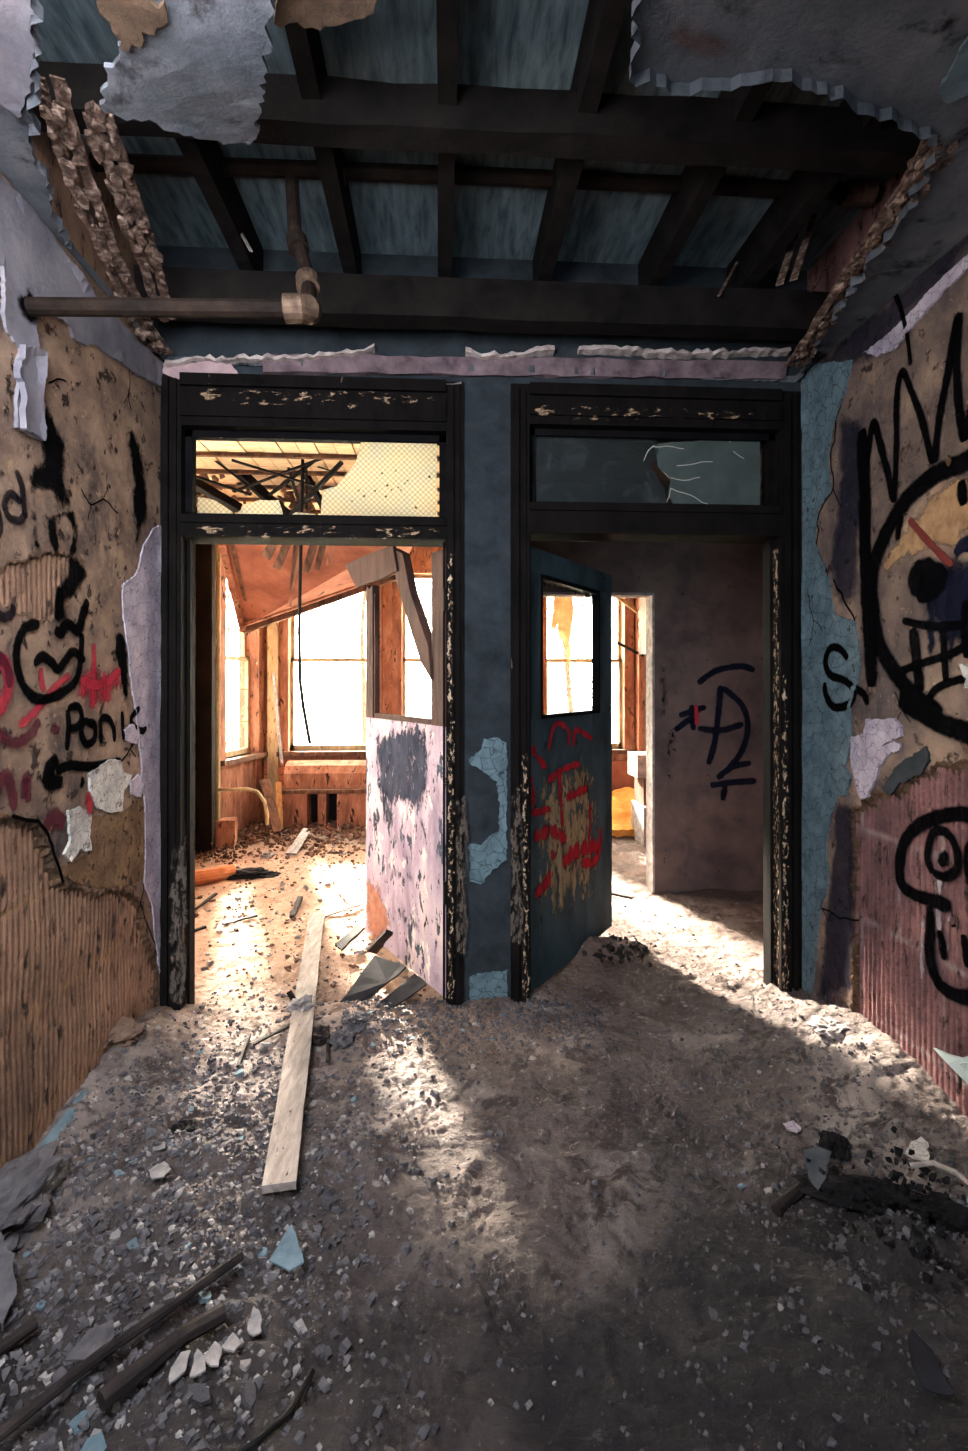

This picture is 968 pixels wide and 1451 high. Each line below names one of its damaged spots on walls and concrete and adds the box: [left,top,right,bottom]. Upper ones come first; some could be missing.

peeling [0,0,37,118]
flaking render [97,0,168,52]
flaking render [274,0,377,31]
flaking render [773,255,968,1116]
flaking render [0,525,189,1170]